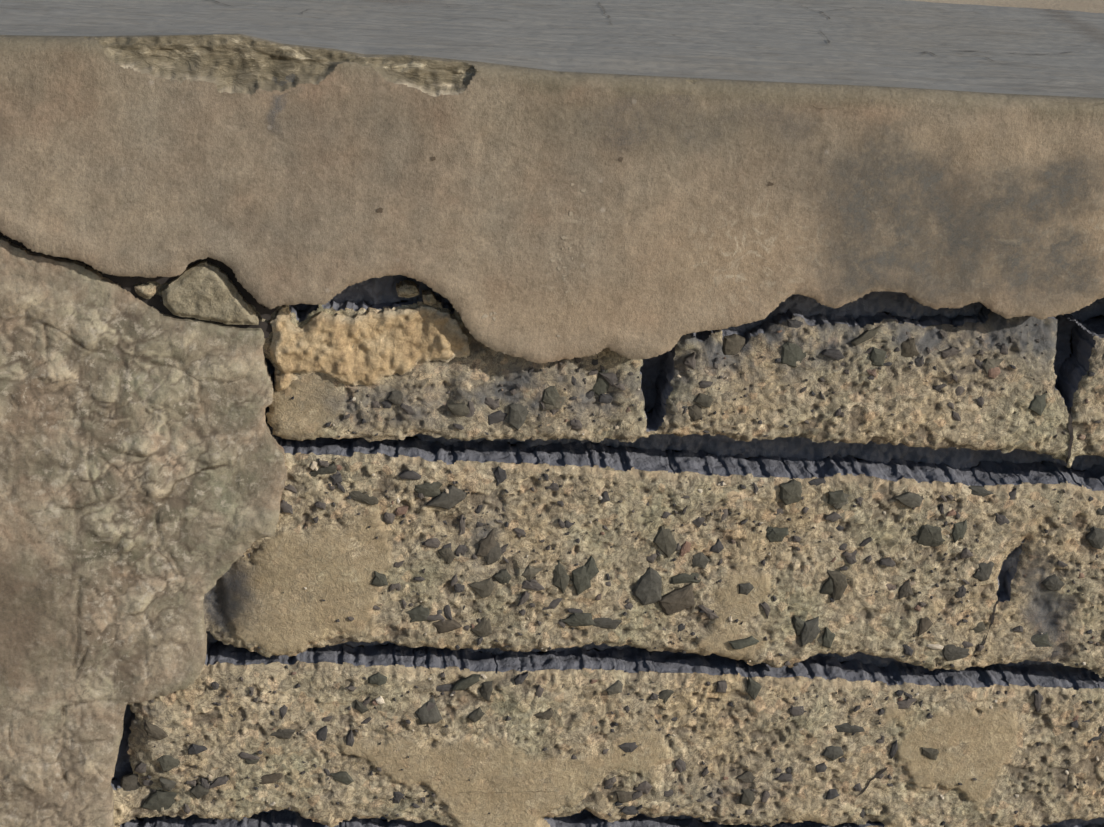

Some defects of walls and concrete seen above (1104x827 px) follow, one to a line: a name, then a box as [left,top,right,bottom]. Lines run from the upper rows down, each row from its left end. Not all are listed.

spalling [84,34,481,97]
damp [828,142,1094,295]
crack [1066,407,1074,464]
spalling [111,260,1104,827]
crack [973,599,1000,655]